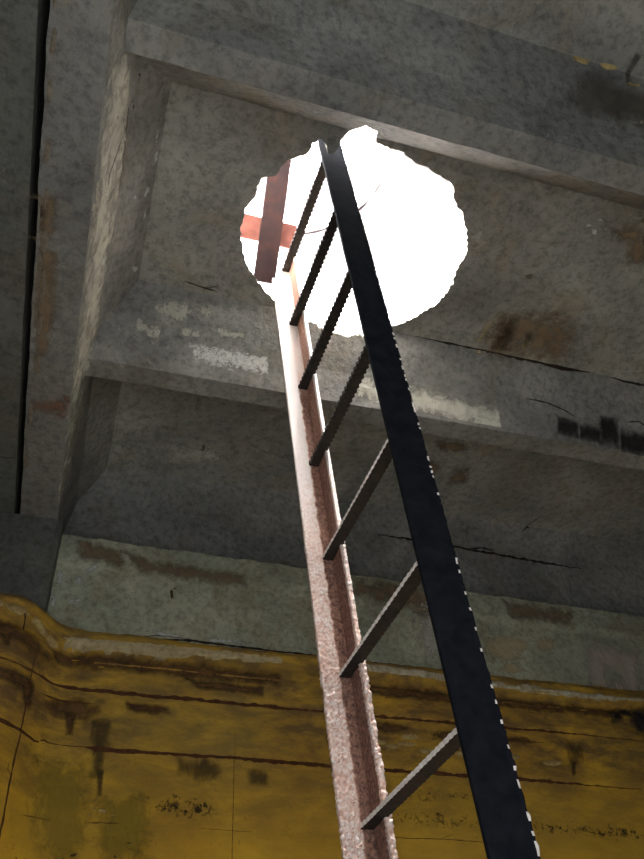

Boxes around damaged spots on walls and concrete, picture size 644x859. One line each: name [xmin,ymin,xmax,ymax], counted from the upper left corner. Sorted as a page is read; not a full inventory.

damp [558,416,644,455]
crack [454,545,581,569]
crack [136,635,314,655]
crack [374,715,455,725]
crack [504,726,642,743]
crack [0,650,331,854]
damp [48,700,145,859]
crack [384,768,468,778]
crack [518,777,642,790]